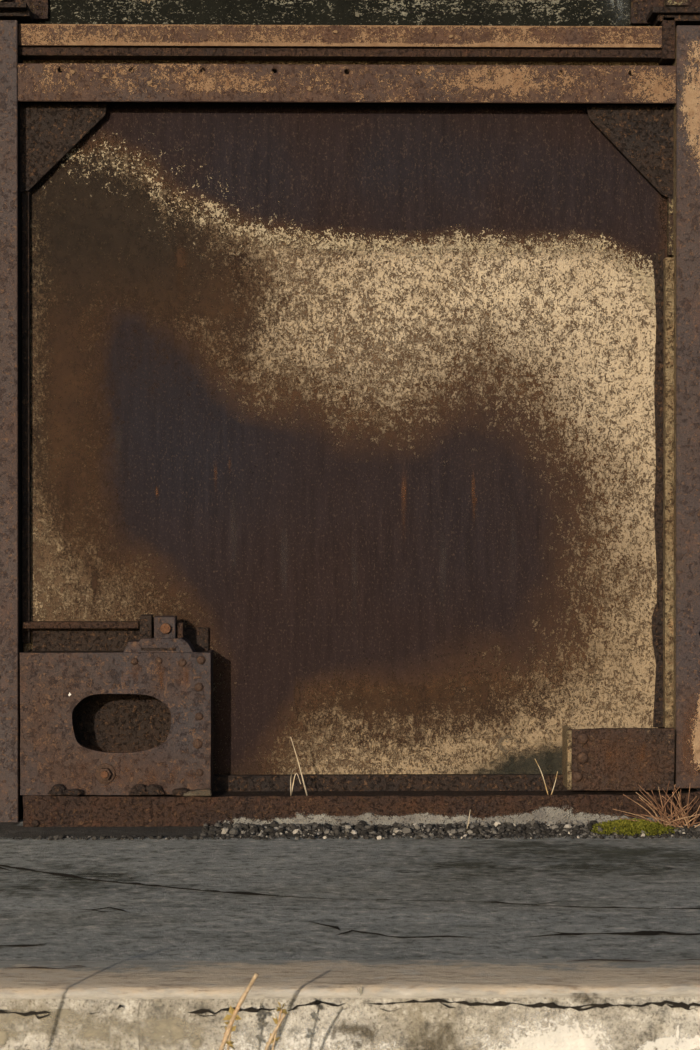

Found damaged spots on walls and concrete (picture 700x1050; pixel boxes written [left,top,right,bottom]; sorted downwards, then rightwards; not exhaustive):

peeling [21,0,662,47]
corrosion [30,105,668,775]
crack [470,900,700,962]
crack [0,1010,50,1019]
leakage [224,1012,454,1050]
crack [187,998,700,1017]
leakage [473,1007,613,1050]
leakage [637,1025,700,1050]